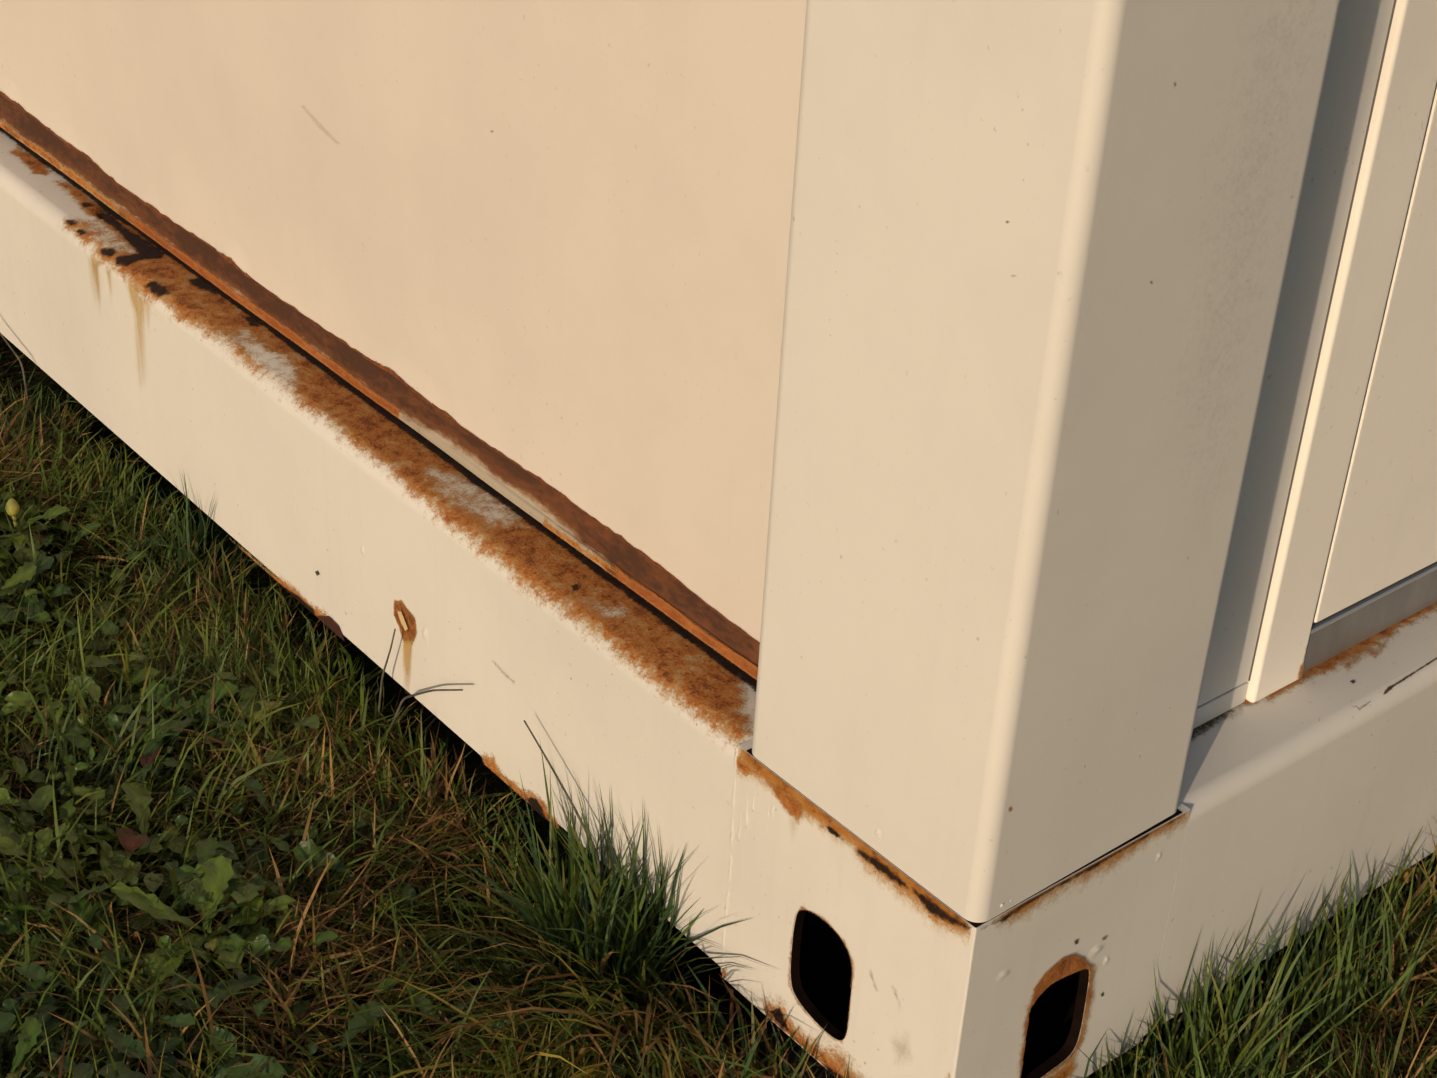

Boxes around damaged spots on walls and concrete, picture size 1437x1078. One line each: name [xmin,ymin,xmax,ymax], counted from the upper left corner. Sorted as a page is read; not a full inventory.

rust [0,95,970,935]
rust [1244,602,1437,705]
rust [992,813,1186,924]
rust [1020,955,1095,1078]